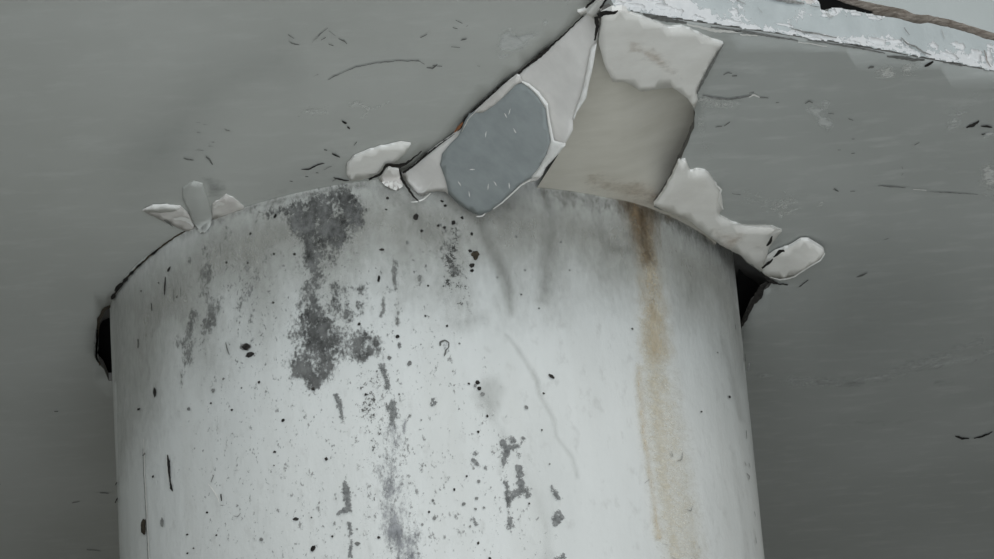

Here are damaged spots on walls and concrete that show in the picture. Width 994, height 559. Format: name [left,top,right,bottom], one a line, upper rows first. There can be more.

peeling [142,203,194,231]
peeling [212,194,245,220]
crack [291,0,618,202]
flaking render [346,0,994,281]
crack [817,0,873,14]
damp [141,186,655,559]
corrosion [624,201,680,559]
crack [955,432,992,440]